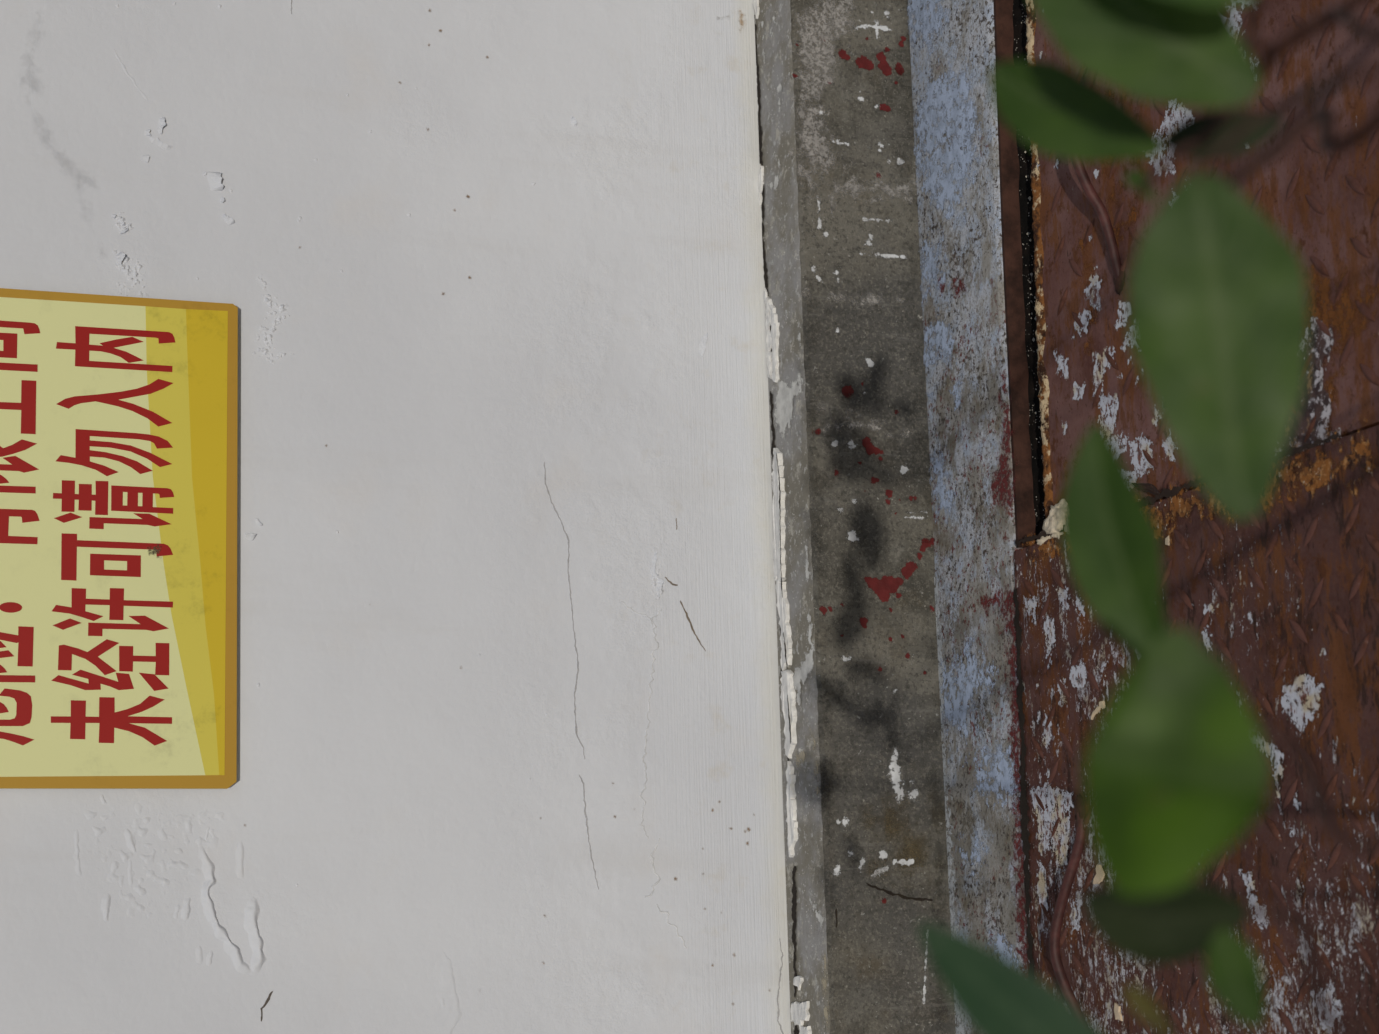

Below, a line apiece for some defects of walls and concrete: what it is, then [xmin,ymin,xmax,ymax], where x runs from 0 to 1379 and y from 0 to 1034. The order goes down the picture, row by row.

rust [1025,0,1036,60]
peeling [907,0,982,411]
spalling [111,212,149,297]
rust [1030,147,1067,518]
peeling [764,288,803,858]
peeling [929,451,956,522]
rust [1022,532,1067,574]
rust [1146,472,1234,549]
rust [1263,419,1378,513]
peeling [934,577,1021,933]
peeling [986,930,1023,967]
peeling [790,976,812,1034]